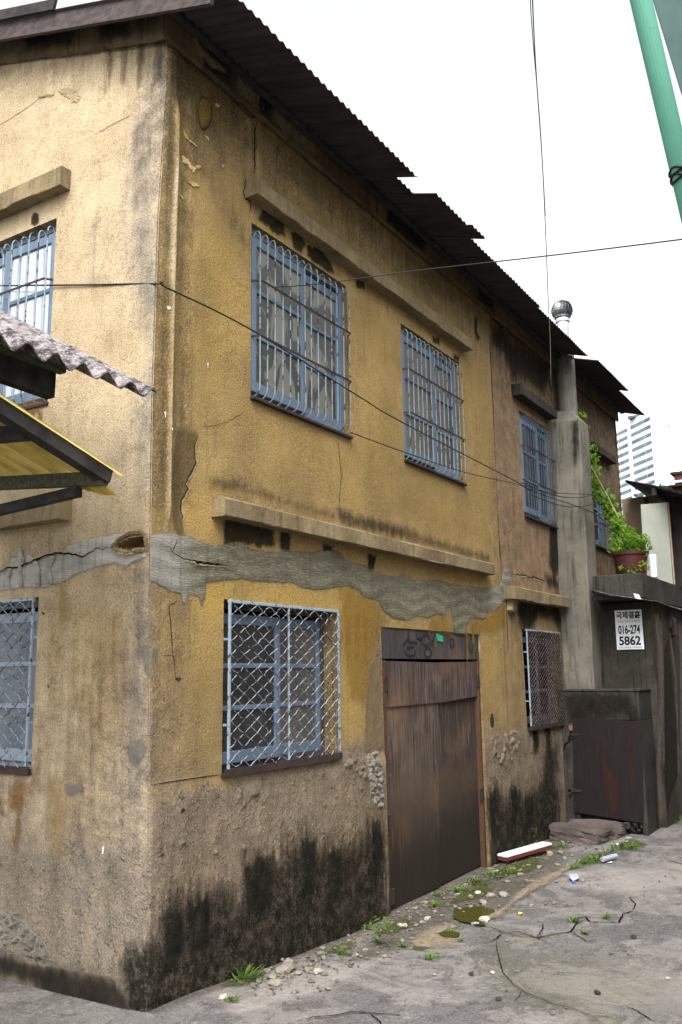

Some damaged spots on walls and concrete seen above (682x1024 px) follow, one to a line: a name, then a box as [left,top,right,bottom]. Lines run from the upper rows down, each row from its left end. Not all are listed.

water stain [100,22,129,72]
peeling [182,156,201,187]
crack [0,546,110,572]
spalling [110,531,149,556]
crack [159,410,247,569]
peeling [344,648,385,809]
water stain [486,728,560,866]
water stain [0,818,390,1012]